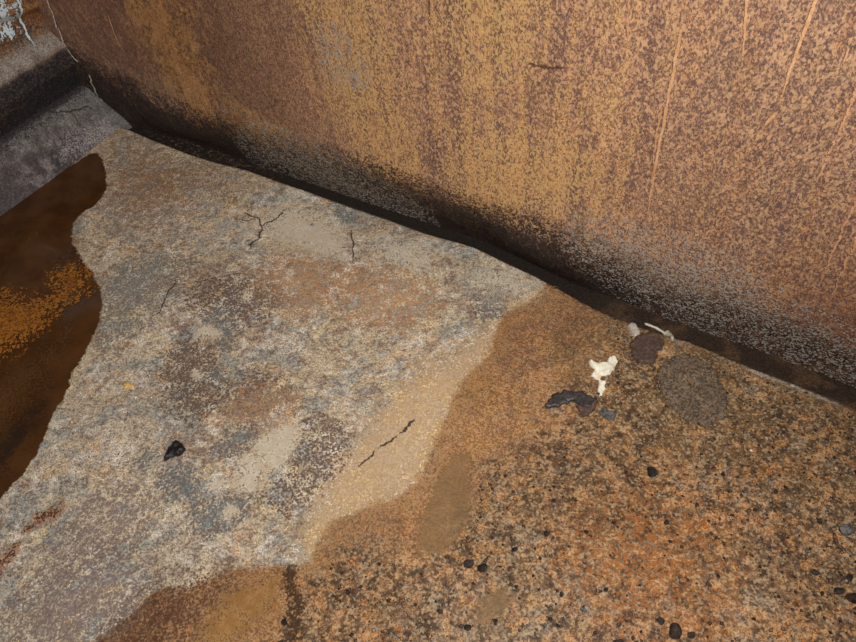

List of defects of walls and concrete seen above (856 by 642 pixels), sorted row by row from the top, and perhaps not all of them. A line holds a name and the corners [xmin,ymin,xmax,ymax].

corrosion [0,131,283,362]
damp [313,20,372,93]
corrosion [294,0,427,199]
damp [0,39,856,388]
corrosion [430,0,550,101]
corrosion [437,110,613,227]
corrosion [647,23,684,215]
corrosion [764,0,818,126]
corrosion [798,88,856,213]
crack [358,420,415,467]
damp [280,277,561,585]
damp [94,565,230,642]